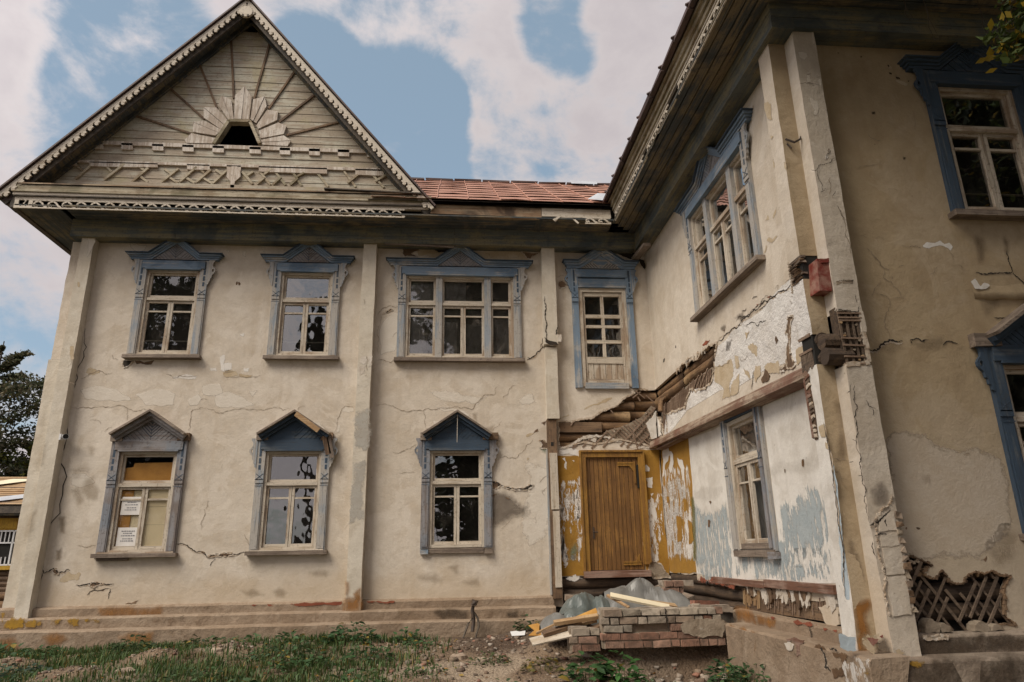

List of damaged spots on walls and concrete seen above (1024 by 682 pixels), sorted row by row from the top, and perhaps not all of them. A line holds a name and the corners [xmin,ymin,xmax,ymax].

crack [815,149,958,354]
crack [931,251,1024,283]
crack [527,297,558,360]
crack [51,332,145,523]
crack [386,385,514,474]
peeling [492,315,803,582]
crack [41,565,113,598]
crack [177,500,249,565]
peeling [642,448,883,682]
spalling [907,555,1018,627]